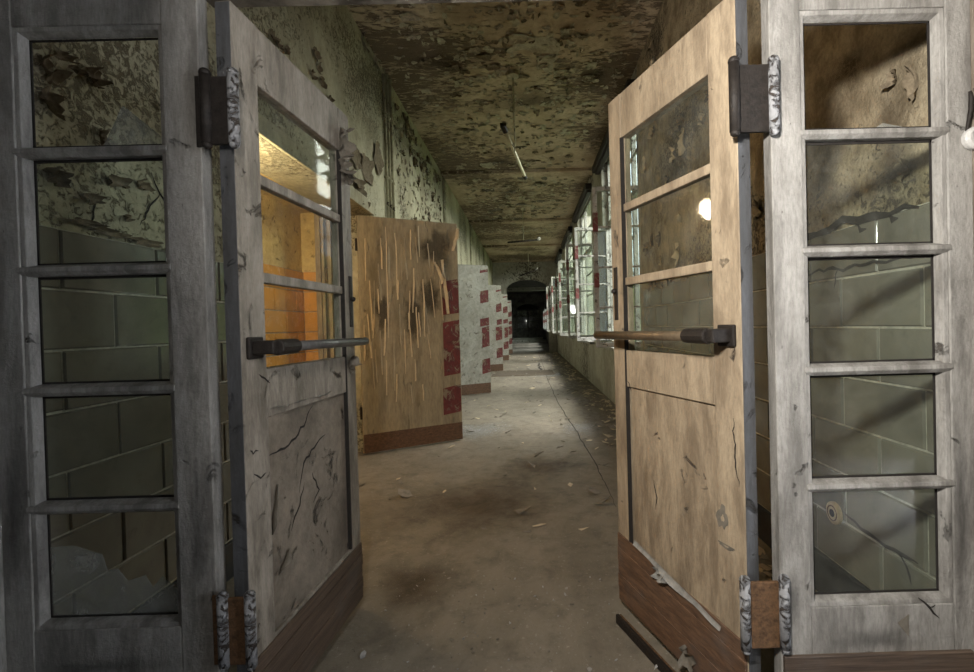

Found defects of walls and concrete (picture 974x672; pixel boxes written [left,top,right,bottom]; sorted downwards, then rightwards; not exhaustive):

peeling [268,28,291,55]
peeling [310,46,335,102]
peeling [384,0,645,234]
peeling [669,113,686,163]
peeling [352,141,384,207]
peeling [642,232,706,292]
crack [537,355,616,506]